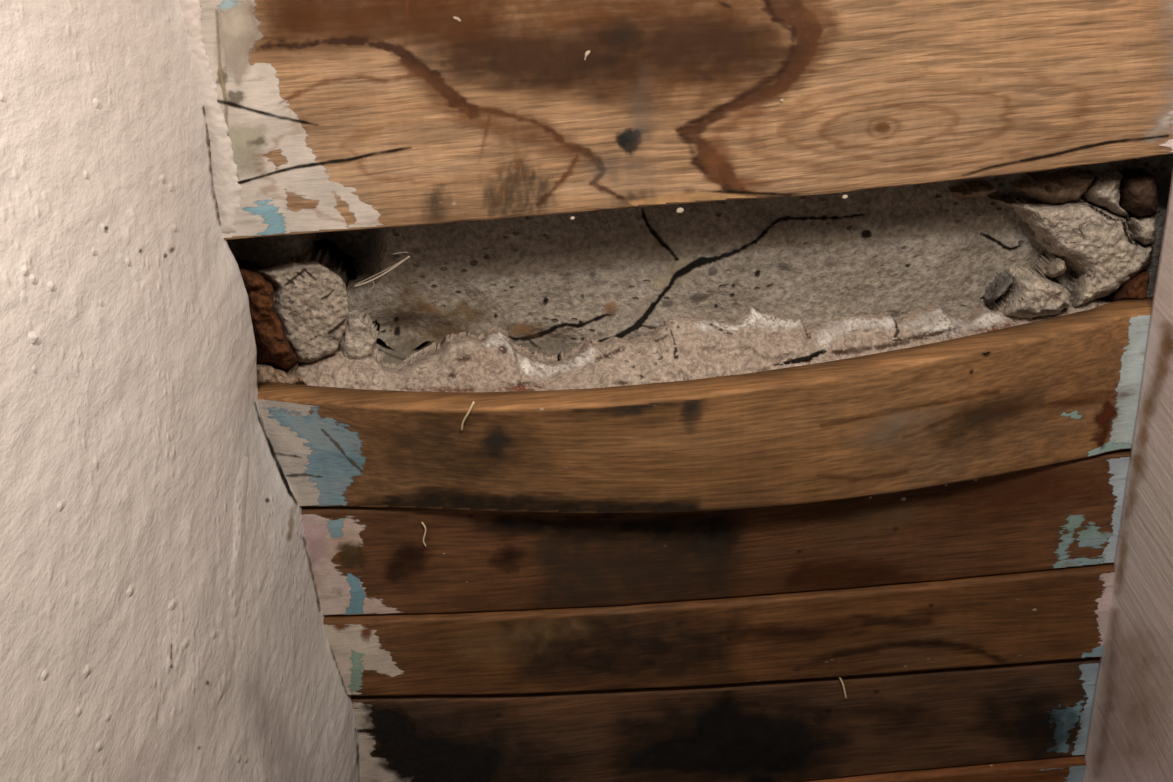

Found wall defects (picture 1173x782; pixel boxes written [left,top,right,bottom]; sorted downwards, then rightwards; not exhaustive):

peeling [200,0,383,238]
crack [203,100,411,224]
damp [261,0,834,218]
crack [499,190,869,384]
spalling [295,258,1113,392]
damp [615,403,651,414]
damp [1133,328,1173,470]
peeling [258,399,411,782]
damp [372,489,735,598]
peeling [1019,314,1151,782]
damp [365,703,530,782]
damp [619,690,845,782]